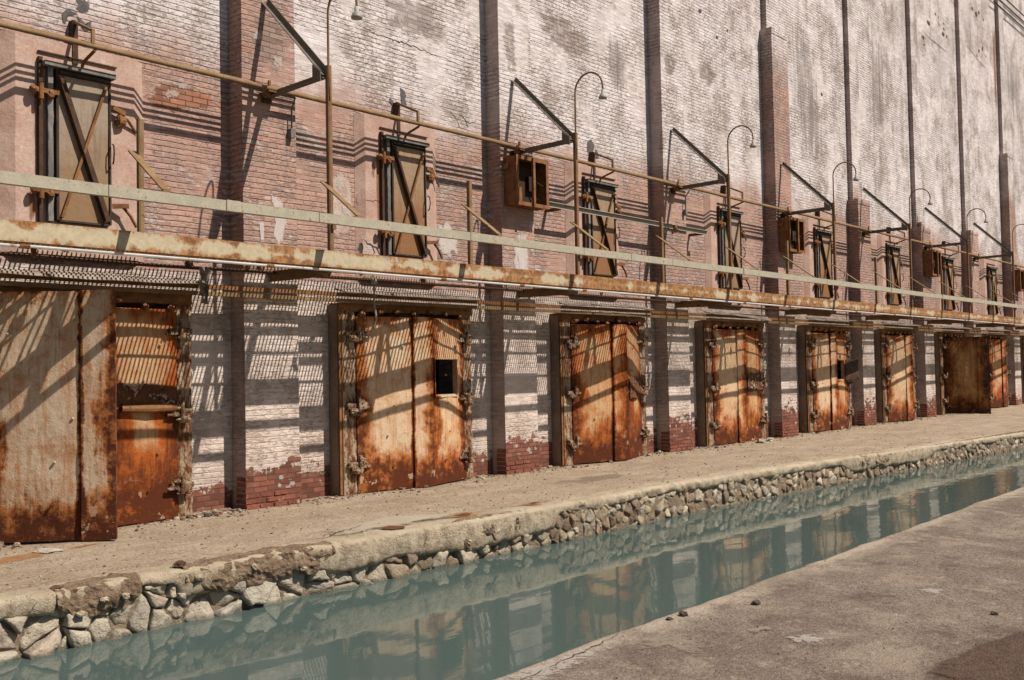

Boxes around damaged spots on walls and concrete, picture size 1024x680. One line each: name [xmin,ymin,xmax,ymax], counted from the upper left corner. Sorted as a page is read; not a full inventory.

peeling [145,83,213,113]
peeling [473,449,493,477]
peeling [506,430,553,474]
peeling [647,428,657,453]
peeling [669,413,698,452]
peeling [192,480,233,512]
peeling [246,456,330,510]